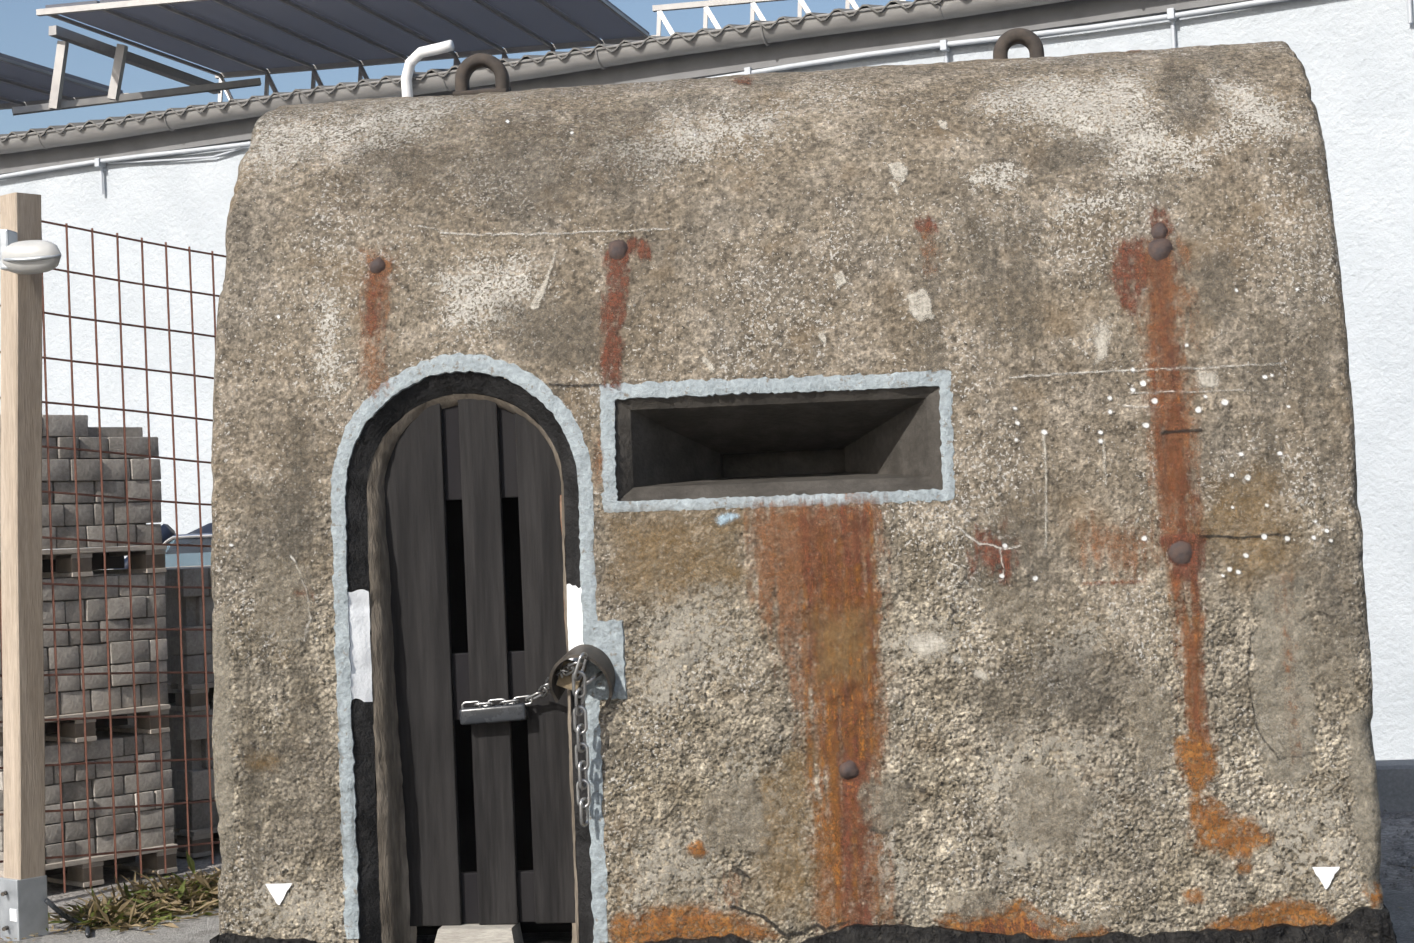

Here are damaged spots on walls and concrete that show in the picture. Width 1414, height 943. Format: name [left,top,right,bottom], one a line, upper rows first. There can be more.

corrosion [365,255,391,398]
corrosion [600,238,651,389]
corrosion [1082,209,1270,872]
corrosion [611,904,776,943]
crack [730,868,850,939]
corrosion [939,899,1107,940]
corrosion [1206,897,1336,931]